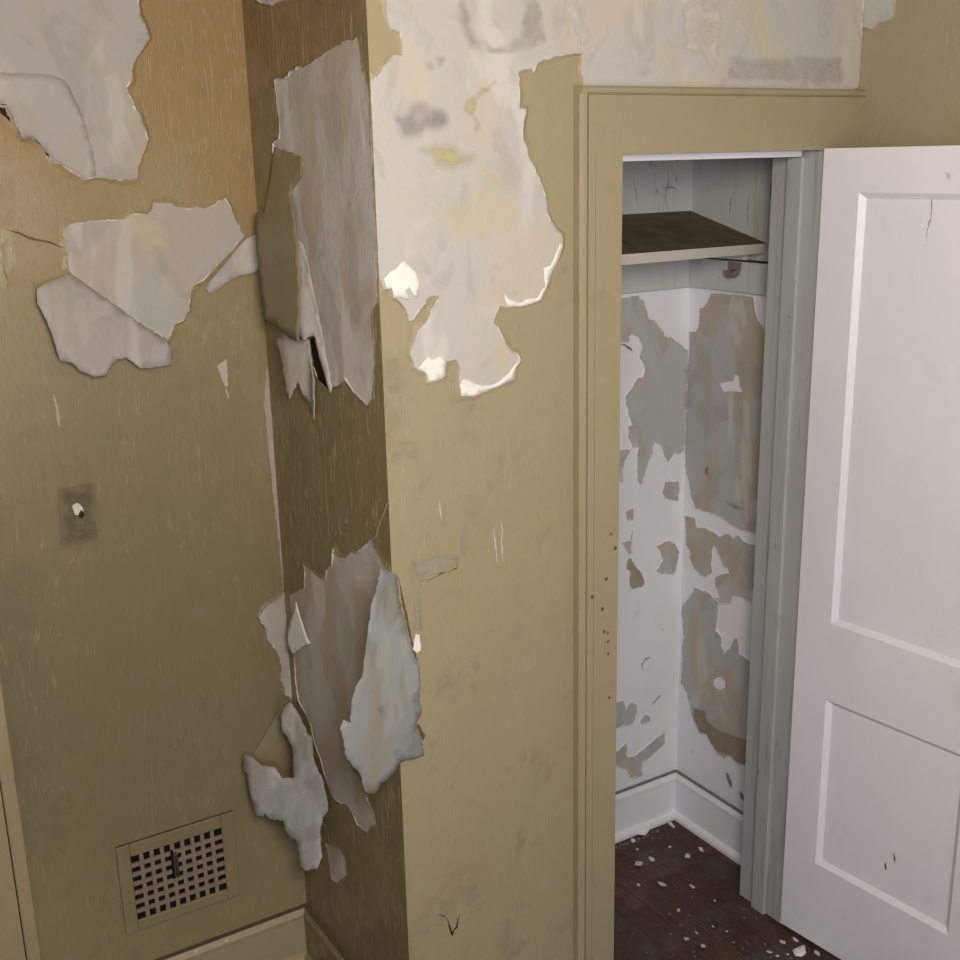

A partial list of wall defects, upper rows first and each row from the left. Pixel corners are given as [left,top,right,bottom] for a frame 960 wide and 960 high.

peeling [0,0,153,186]
peeling [37,0,896,420]
peeling [616,291,765,767]
peeling [256,537,392,834]
peeling [325,842,349,886]
peeling [616,730,666,779]